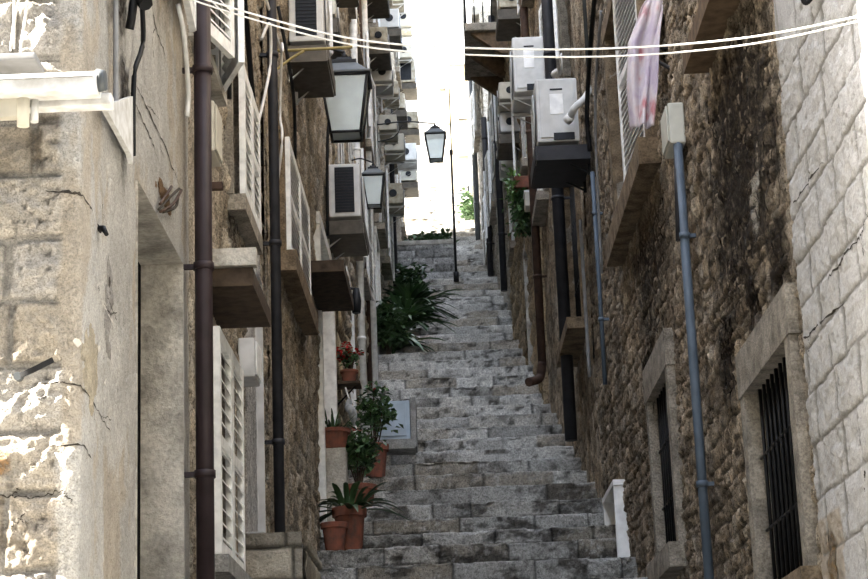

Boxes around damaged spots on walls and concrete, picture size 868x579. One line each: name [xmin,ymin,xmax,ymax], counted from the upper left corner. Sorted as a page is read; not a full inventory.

crack [47,190,108,229]
water stain [704,0,788,401]
crack [41,381,111,430]
crack [49,443,92,459]
crack [0,488,72,535]